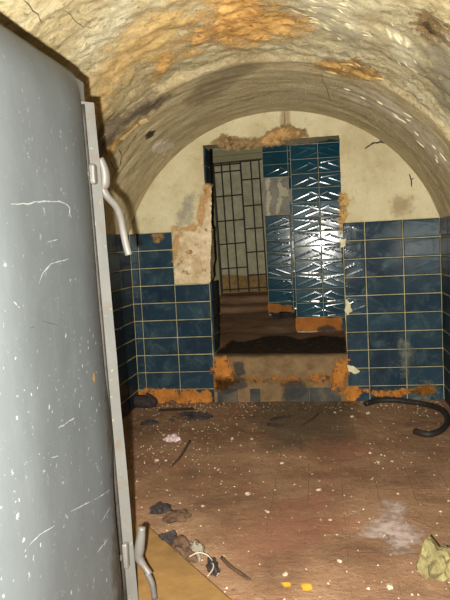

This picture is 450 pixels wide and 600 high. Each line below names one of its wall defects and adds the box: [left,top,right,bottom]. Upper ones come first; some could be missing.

spalling [409,11,450,45]
spalling [314,57,384,81]
spalling [211,124,309,151]
spalling [171,184,212,284]
spalling [337,192,349,247]